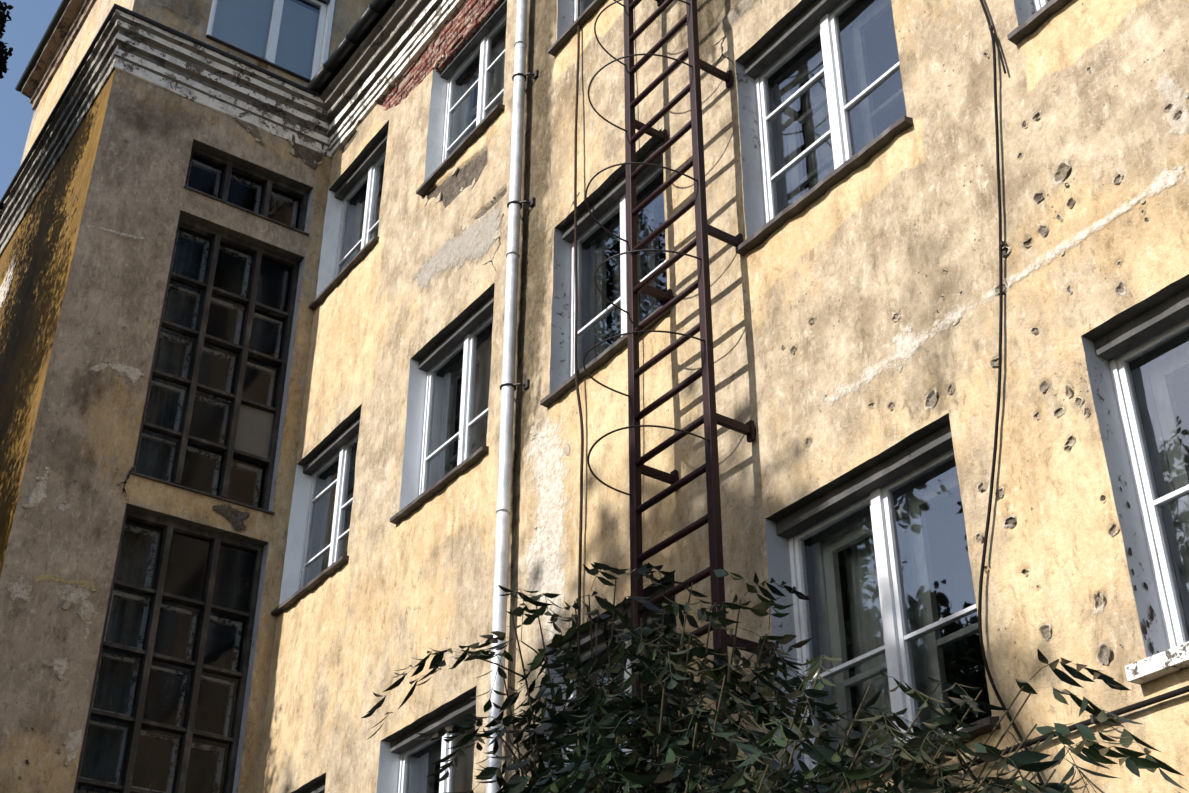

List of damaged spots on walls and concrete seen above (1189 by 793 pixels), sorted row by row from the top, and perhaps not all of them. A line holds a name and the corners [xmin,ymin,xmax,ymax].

flaking render [381,0,503,111]
spalling [289,134,324,170]
spalling [423,150,488,208]
spalling [1002,160,1074,256]
spalling [1115,282,1127,296]
spalling [1054,385,1090,417]
spalling [1064,434,1075,451]
spalling [977,482,1004,498]
spalling [1094,591,1104,613]
spalling [1039,623,1051,640]
peeling [1143,605,1159,655]
spalling [1097,643,1122,665]